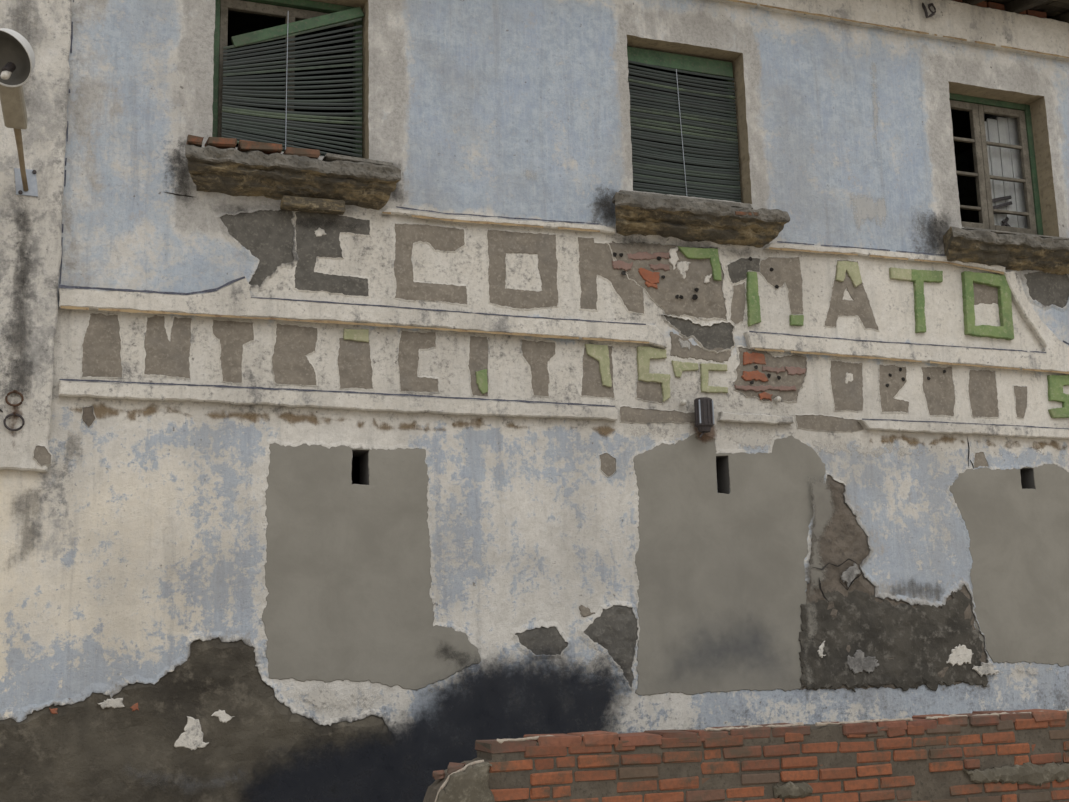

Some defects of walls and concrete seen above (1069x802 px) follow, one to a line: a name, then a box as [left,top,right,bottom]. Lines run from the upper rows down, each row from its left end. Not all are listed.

damp [12,239,29,392]
spalling [607,240,864,433]
spalling [1019,270,1069,312]
spalling [0,630,399,802]
damp [244,651,630,802]
spalling [510,600,640,691]
spalling [799,471,1005,692]